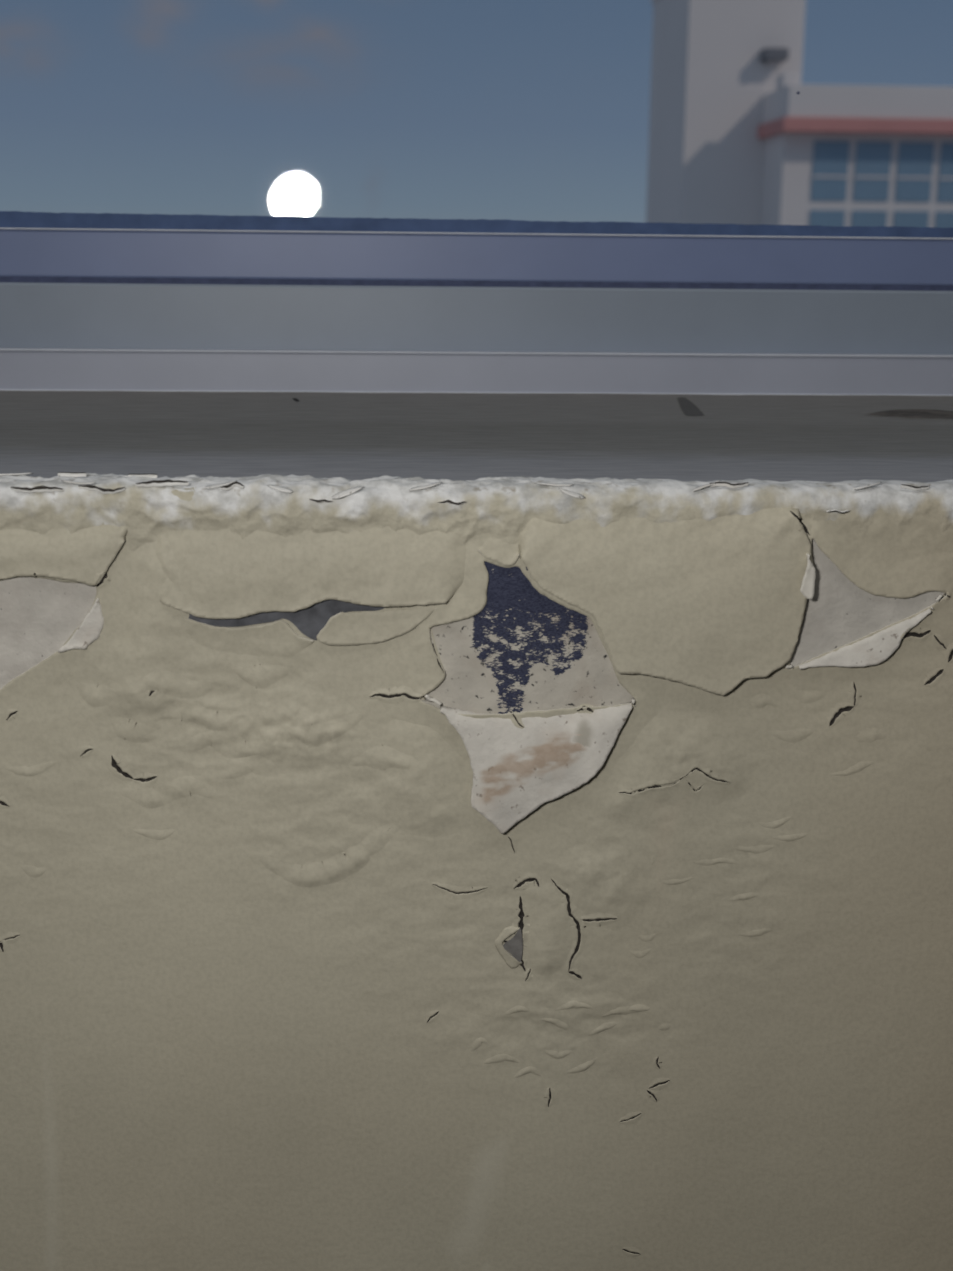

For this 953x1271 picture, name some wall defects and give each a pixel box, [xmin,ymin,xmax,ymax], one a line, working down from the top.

peeling [0,472,953,834]
crack [900,626,953,688]
crack [827,681,862,727]
crack [0,793,10,809]
crack [431,835,617,981]